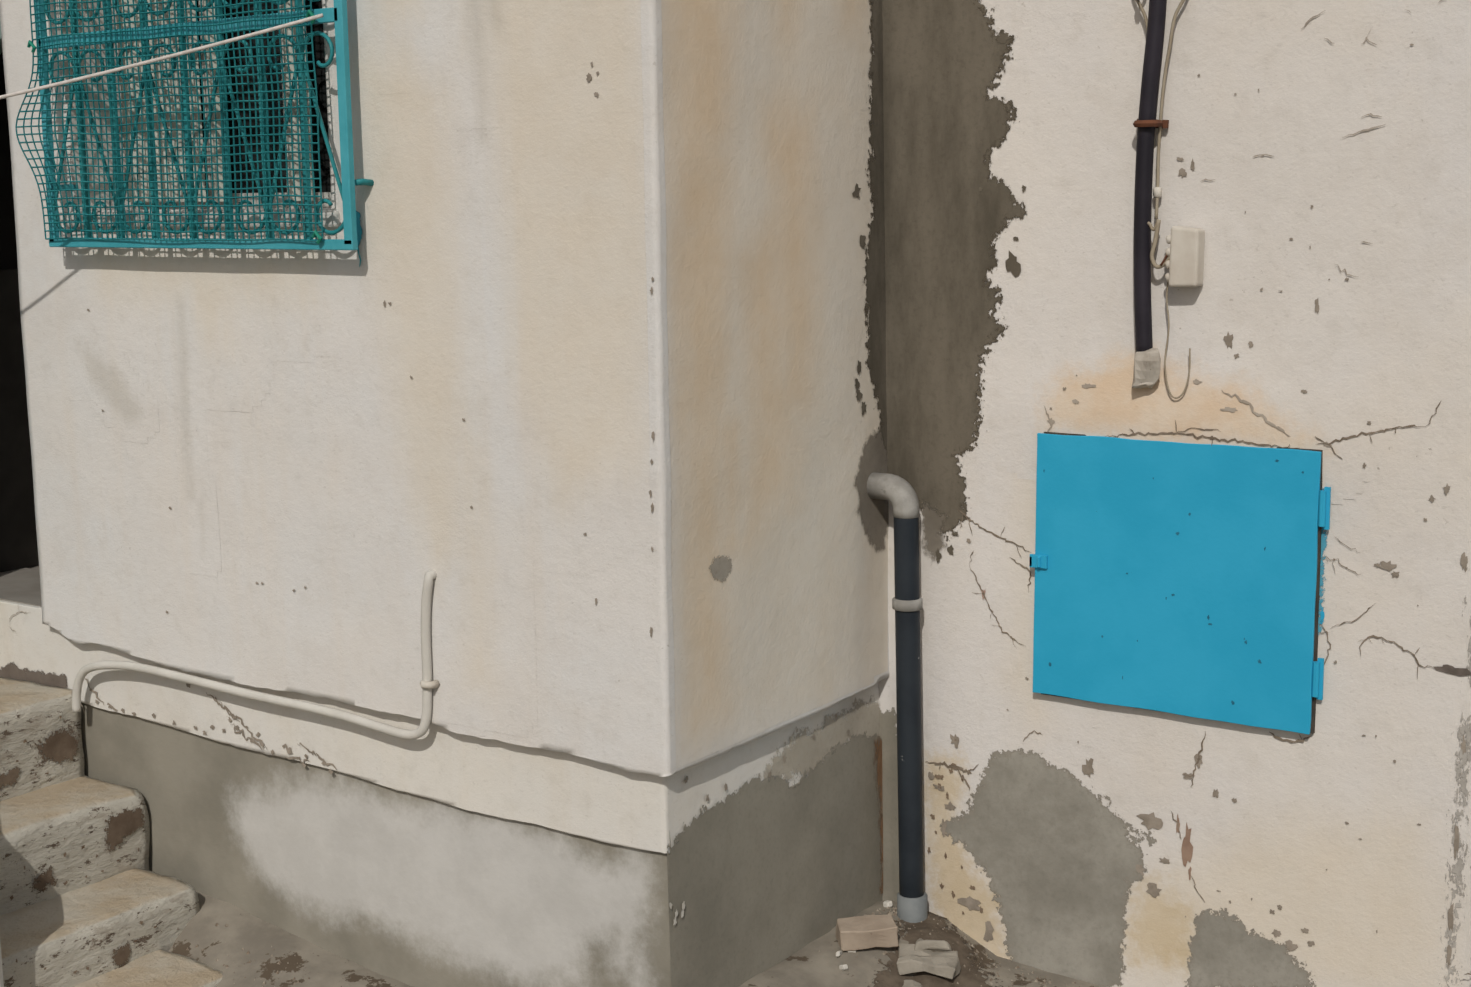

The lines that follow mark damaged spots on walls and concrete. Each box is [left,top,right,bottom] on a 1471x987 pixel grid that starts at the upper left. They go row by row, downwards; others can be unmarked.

peeling [1005,237,1021,277]
peeling [855,360,867,415]
crack [1105,401,1441,459]
crack [954,505,1031,649]
crack [1319,537,1471,678]
peeling [0,716,80,789]
crack [1270,732,1312,743]
peeling [10,807,147,901]
peeling [667,698,899,987]
flaking render [927,748,1193,987]
peeling [1439,712,1471,987]
peeling [73,921,157,974]